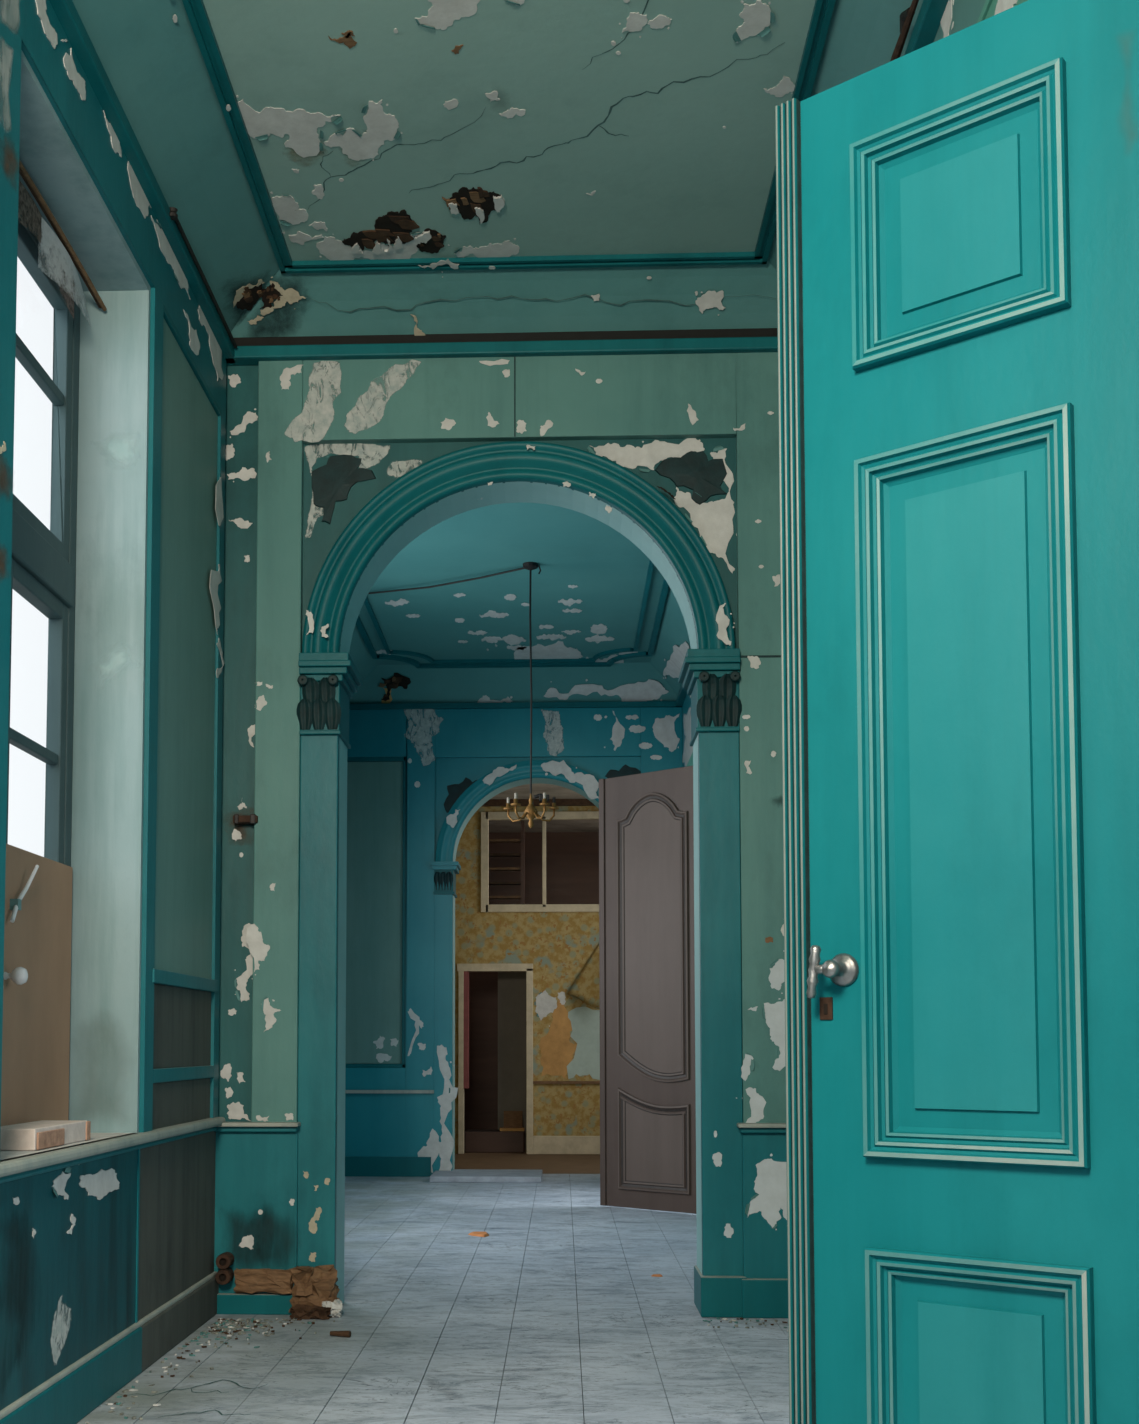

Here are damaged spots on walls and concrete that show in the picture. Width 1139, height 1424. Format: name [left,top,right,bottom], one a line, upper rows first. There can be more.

peeling [226,95,402,173]
crack [308,107,486,209]
crack [409,42,785,193]
peeling [270,184,520,278]
peeling [280,360,422,538]
peeling [587,404,737,573]
peeling [228,923,281,1031]
flaking render [534,990,600,1080]
peeling [748,924,785,1071]
peeling [736,1053,766,1123]
peeling [52,1164,120,1235]
peeling [745,1153,787,1230]